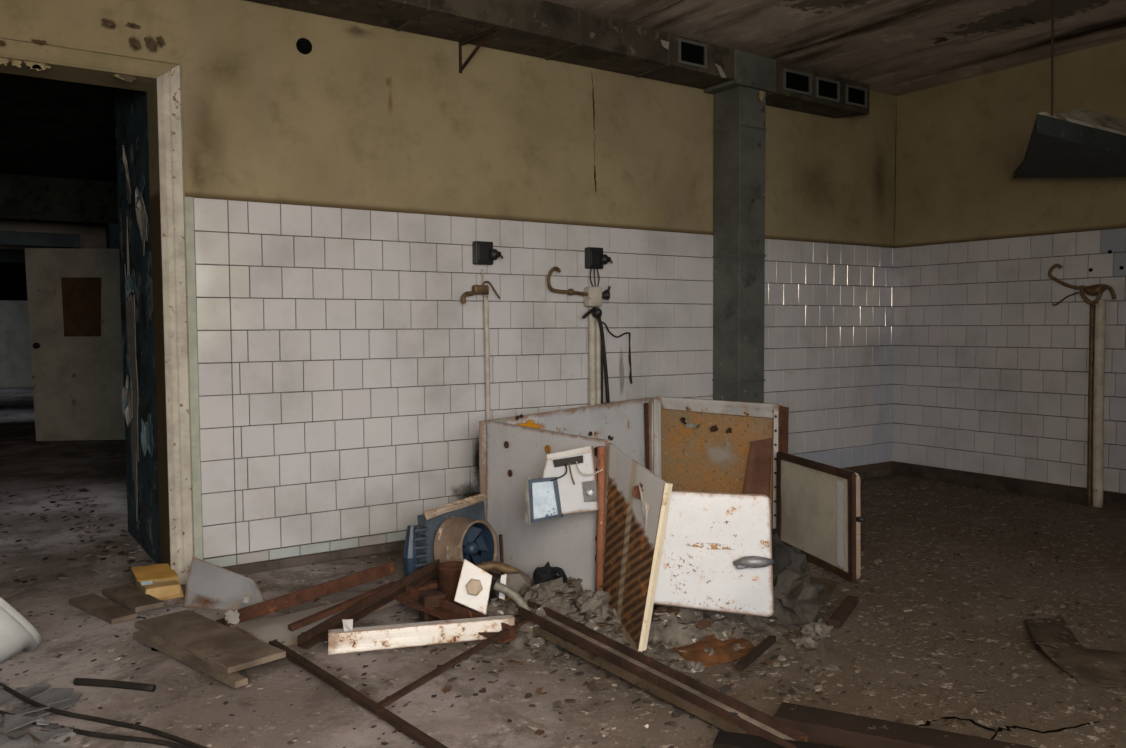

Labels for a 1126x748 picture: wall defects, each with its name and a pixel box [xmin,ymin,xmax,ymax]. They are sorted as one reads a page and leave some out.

flaking render [101,19,165,52]
peeling [0,58,50,71]
peeling [122,146,153,521]
crack [917,716,1100,739]